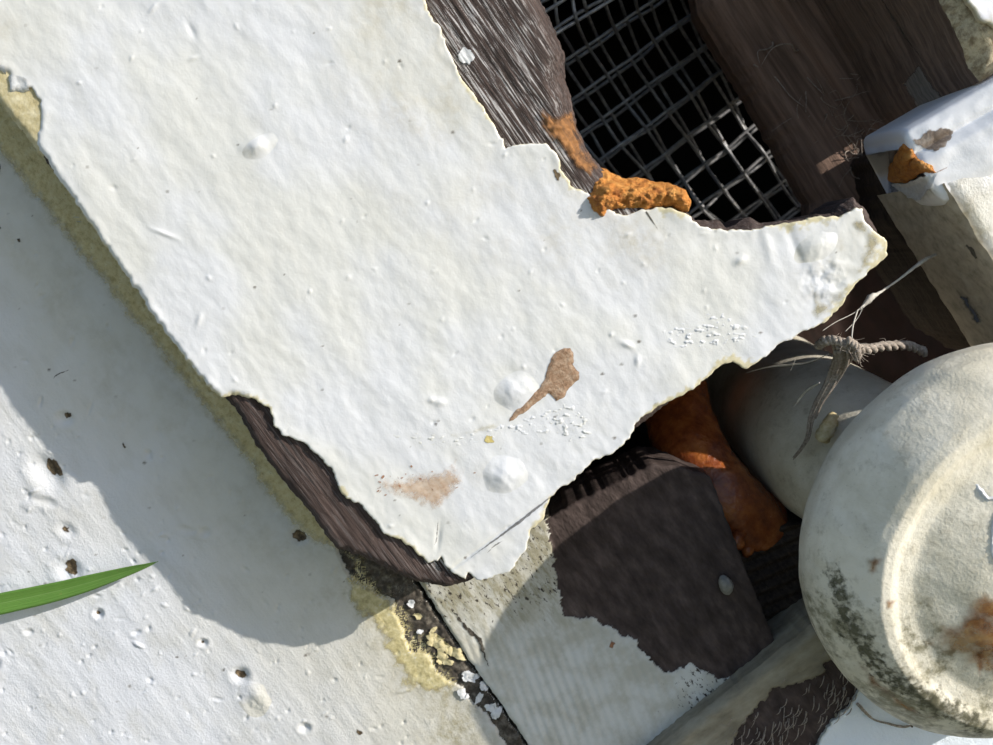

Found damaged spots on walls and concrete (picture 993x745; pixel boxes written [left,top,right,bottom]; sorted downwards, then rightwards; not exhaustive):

peeling [0,65,44,158]
spalling [542,0,801,223]
spalling [293,530,306,542]